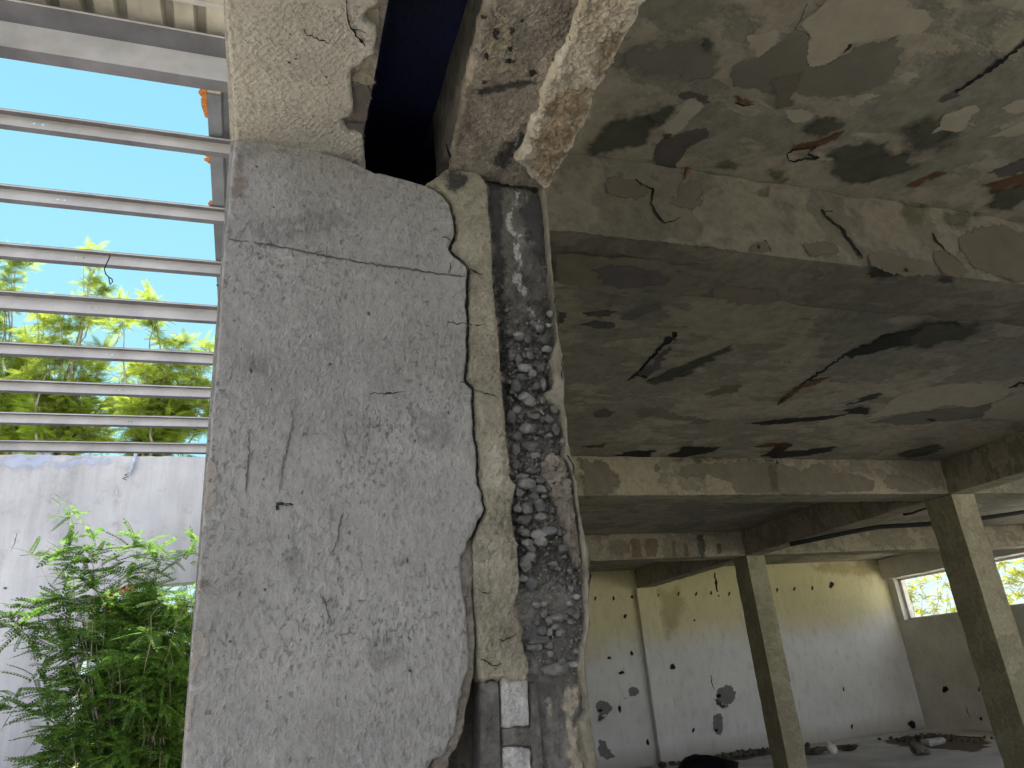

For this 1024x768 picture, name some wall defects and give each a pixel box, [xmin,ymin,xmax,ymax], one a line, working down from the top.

crack [346,0,365,46]
crack [938,41,1024,103]
rust [198,89,208,118]
spalling [653,91,710,168]
rust [787,131,843,163]
peeling [932,105,980,134]
rust [906,171,947,187]
rust [983,158,1024,210]
crack [822,209,863,259]
peeling [868,224,1024,282]
crack [230,216,500,520]
flaking render [505,310,581,677]